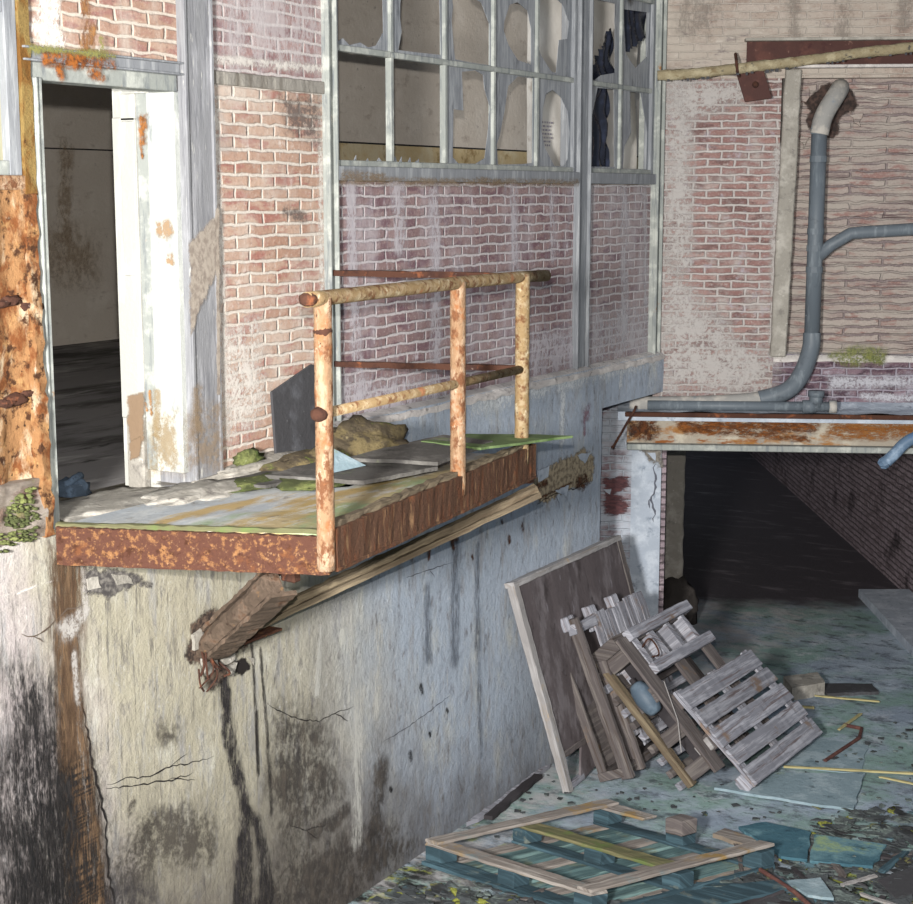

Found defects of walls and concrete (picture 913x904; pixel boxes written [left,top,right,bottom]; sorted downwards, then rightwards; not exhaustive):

rust [42,0,116,81]
rust [138,116,147,159]
spalling [799,83,832,149]
spalling [827,89,863,138]
peeling [188,208,221,395]
water stain [529,79,781,448]
rust [628,421,659,440]
rust [676,421,913,442]
flaking render [533,447,629,516]
water stain [0,664,214,904]
crack [81,695,213,904]
water stain [218,603,410,904]